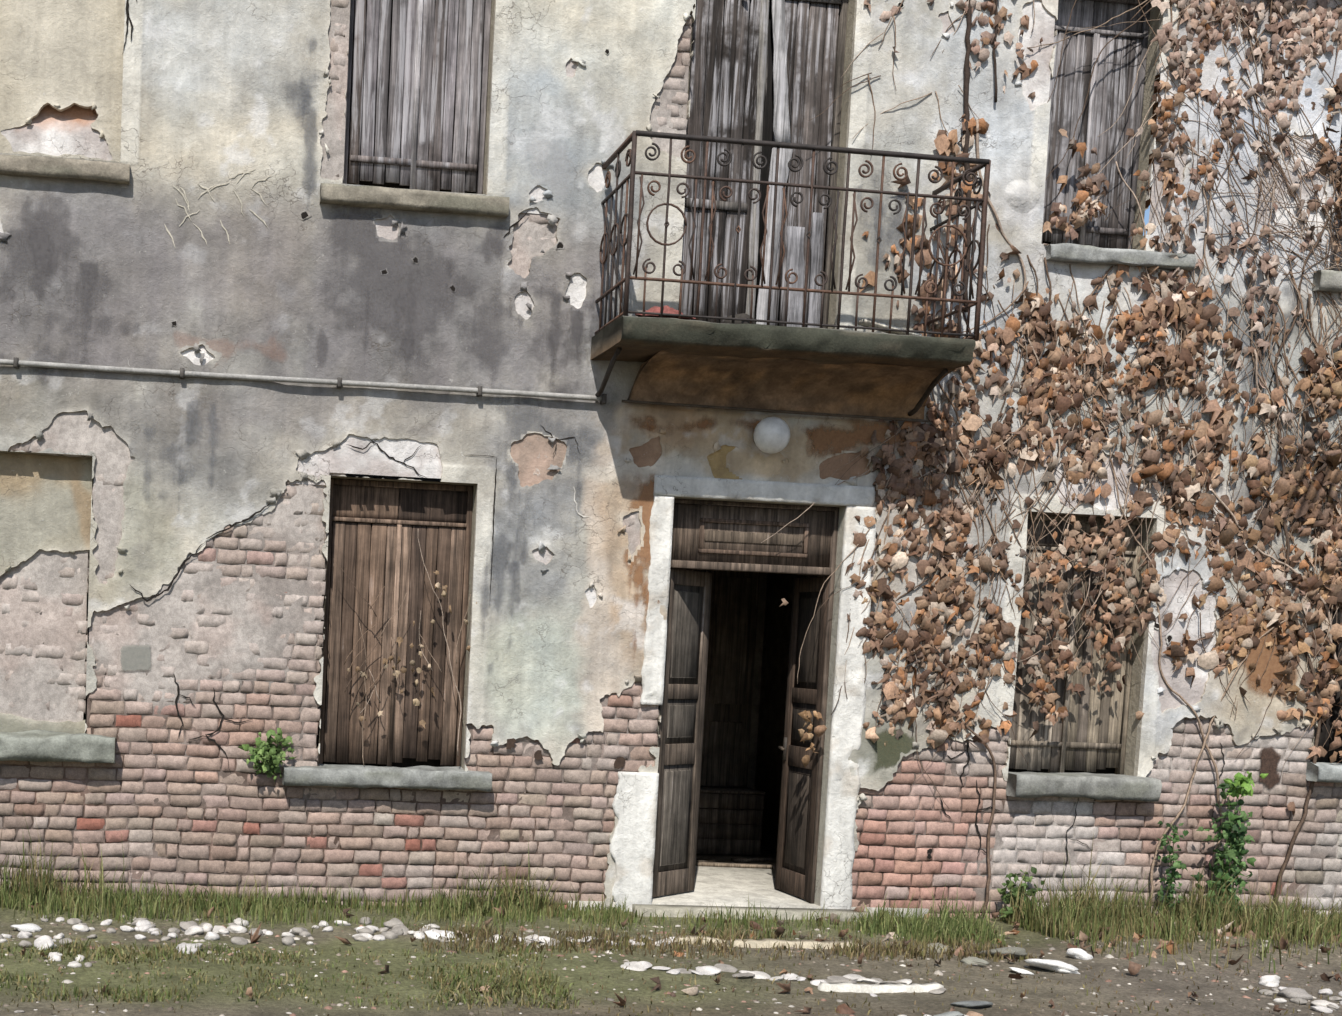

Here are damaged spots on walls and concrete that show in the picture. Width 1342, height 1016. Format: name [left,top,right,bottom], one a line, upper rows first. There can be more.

spalling [1,102,112,161]
crack [122,0,137,55]
spalling [319,0,350,184]
spalling [646,13,692,158]
water stain [0,204,73,295]
water stain [333,205,474,356]
spalling [508,186,559,320]
crack [346,439,425,477]
flaking render [819,451,873,486]
crack [174,675,252,773]
spalling [0,411,659,909]
spalling [851,567,1342,918]